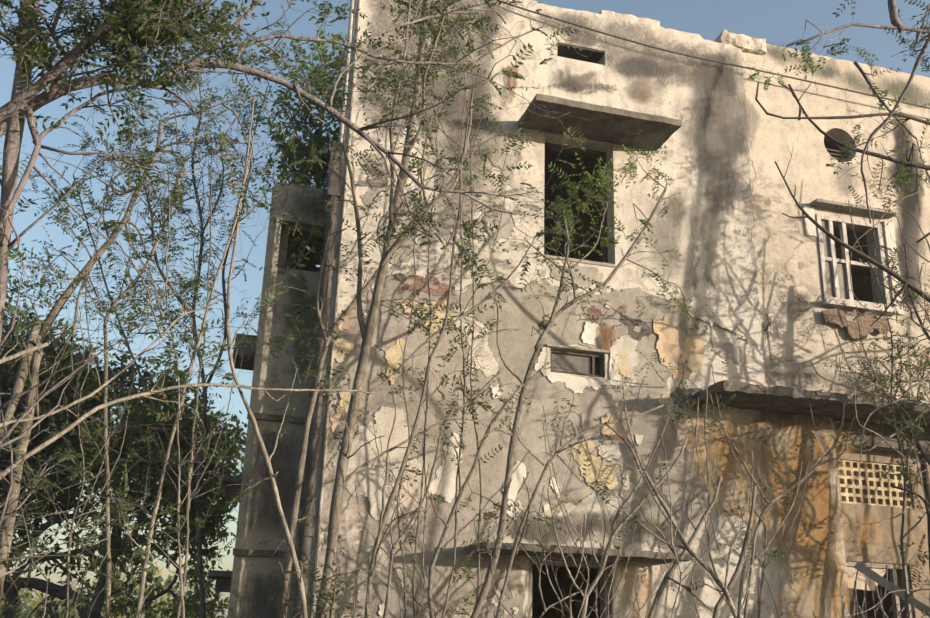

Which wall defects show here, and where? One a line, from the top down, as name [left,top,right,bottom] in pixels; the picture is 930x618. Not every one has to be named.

leakage [540,13,759,289]
crack [695,57,826,370]
leakage [893,113,924,316]
flaking render [307,191,754,618]
leakage [517,514,682,542]
leakage [754,410,832,429]